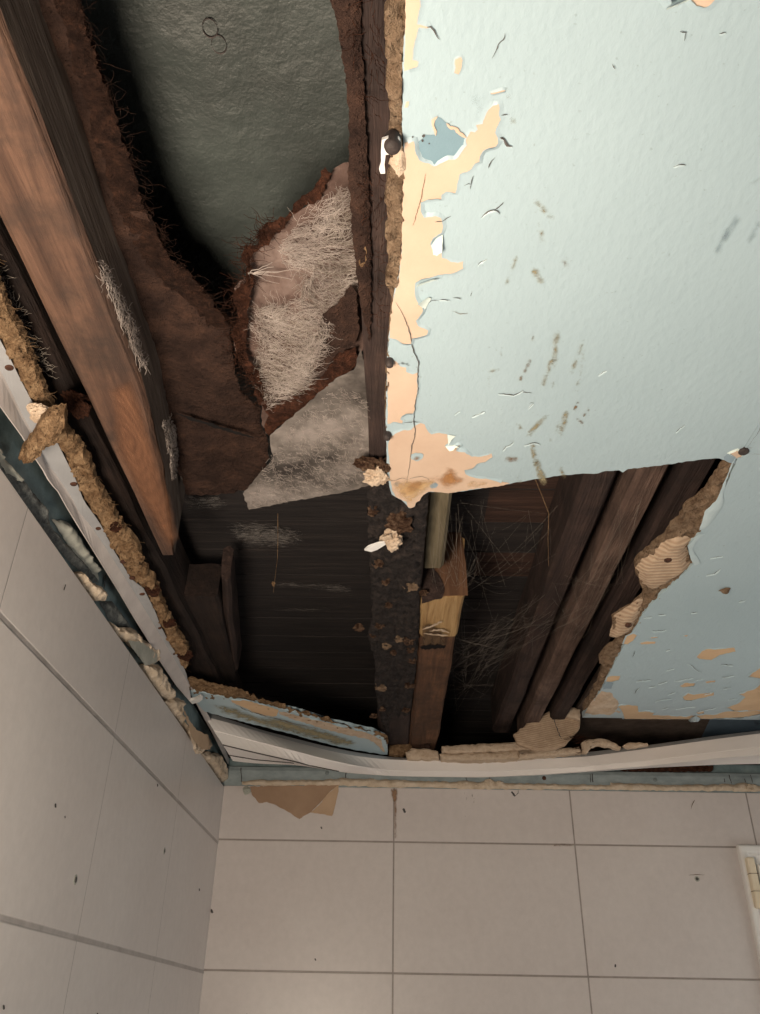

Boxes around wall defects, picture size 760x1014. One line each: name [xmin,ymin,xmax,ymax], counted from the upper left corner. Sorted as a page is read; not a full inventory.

peeling [657,0,721,13]
peeling [384,0,510,508]
crack [394,303,429,481]
spalling [582,448,744,710]
peeling [618,667,760,722]